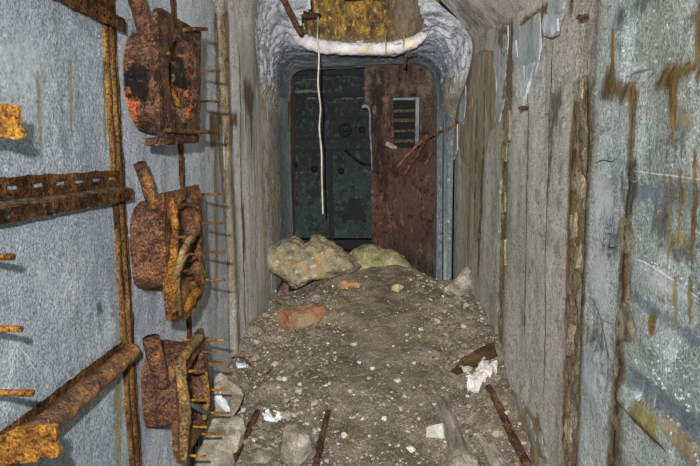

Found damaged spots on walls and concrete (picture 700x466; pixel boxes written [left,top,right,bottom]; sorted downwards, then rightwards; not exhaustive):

spalling [300,0,427,43]
peeling [574,78,585,102]
rust [657,0,700,144]
flaking render [453,0,567,240]
rust [601,29,636,212]
peeling [574,175,586,201]
peeling [570,212,583,269]
spalling [615,300,638,342]
peeling [634,322,694,390]